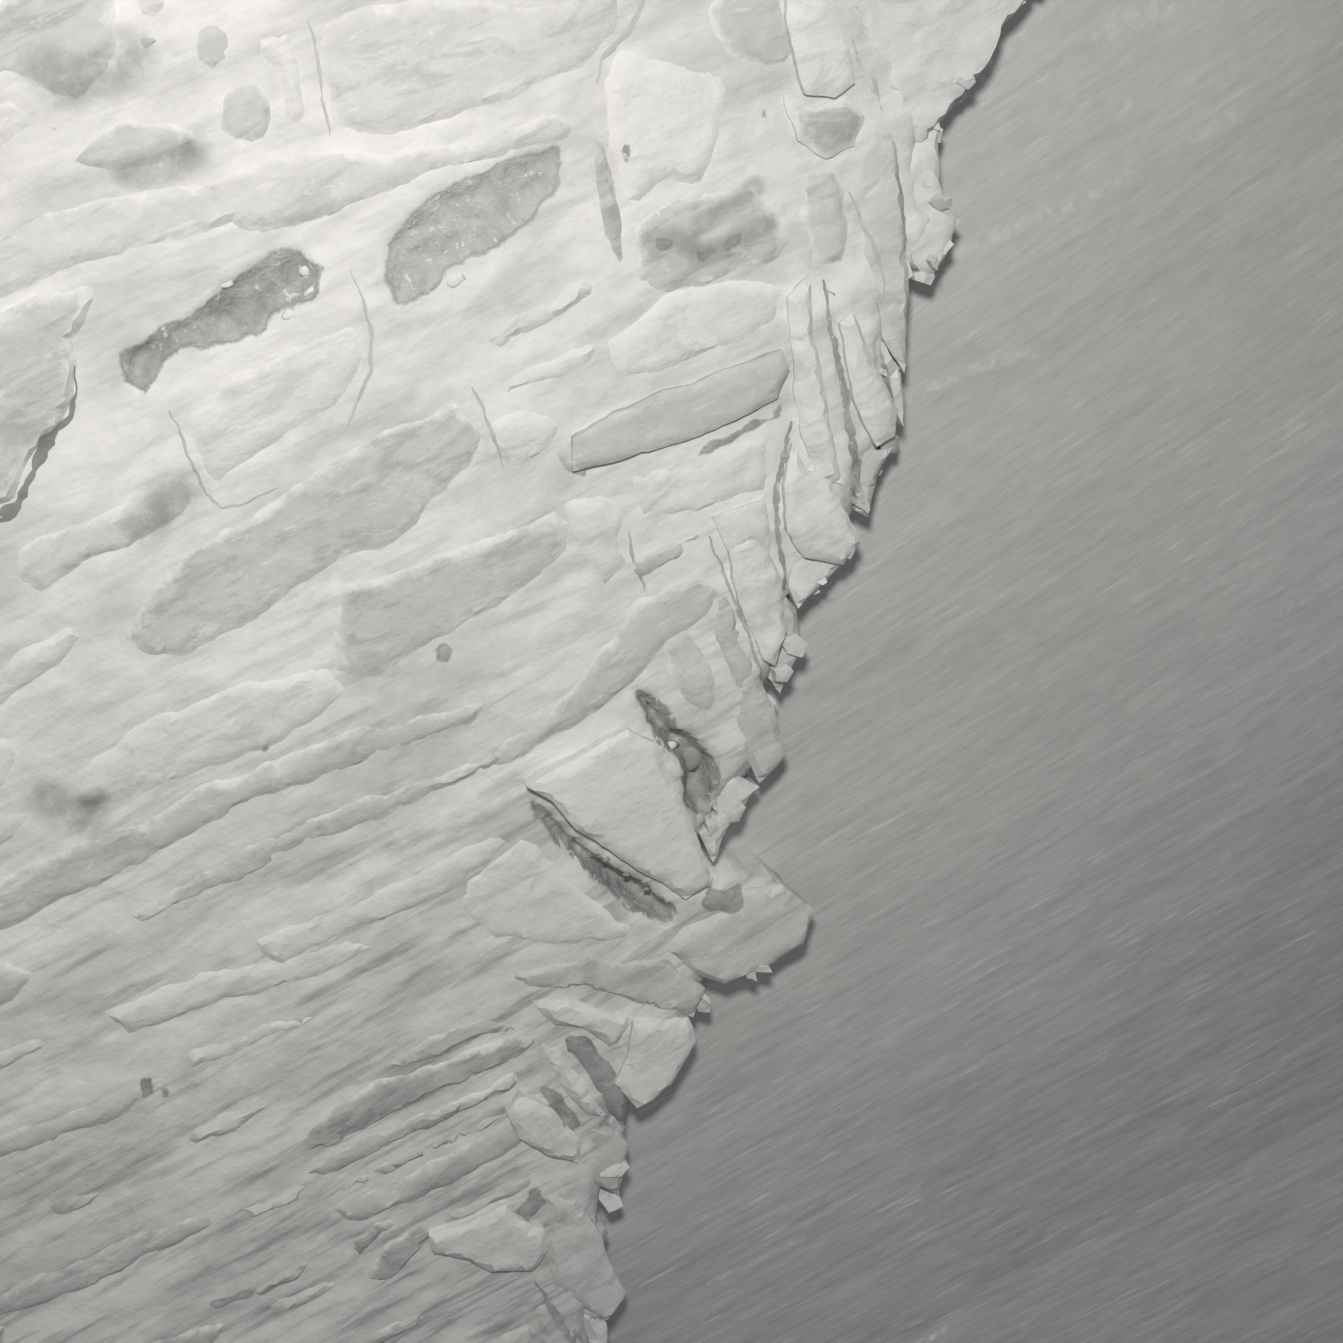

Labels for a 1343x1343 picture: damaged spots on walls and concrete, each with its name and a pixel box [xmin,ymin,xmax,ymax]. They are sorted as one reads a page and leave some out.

spalling [386,147,560,304]
spalling [698,234,741,261]
spalling [120,249,320,391]
spalling [437,644,451,661]
spalling [636,690,720,817]
spalling [141,1078,168,1097]